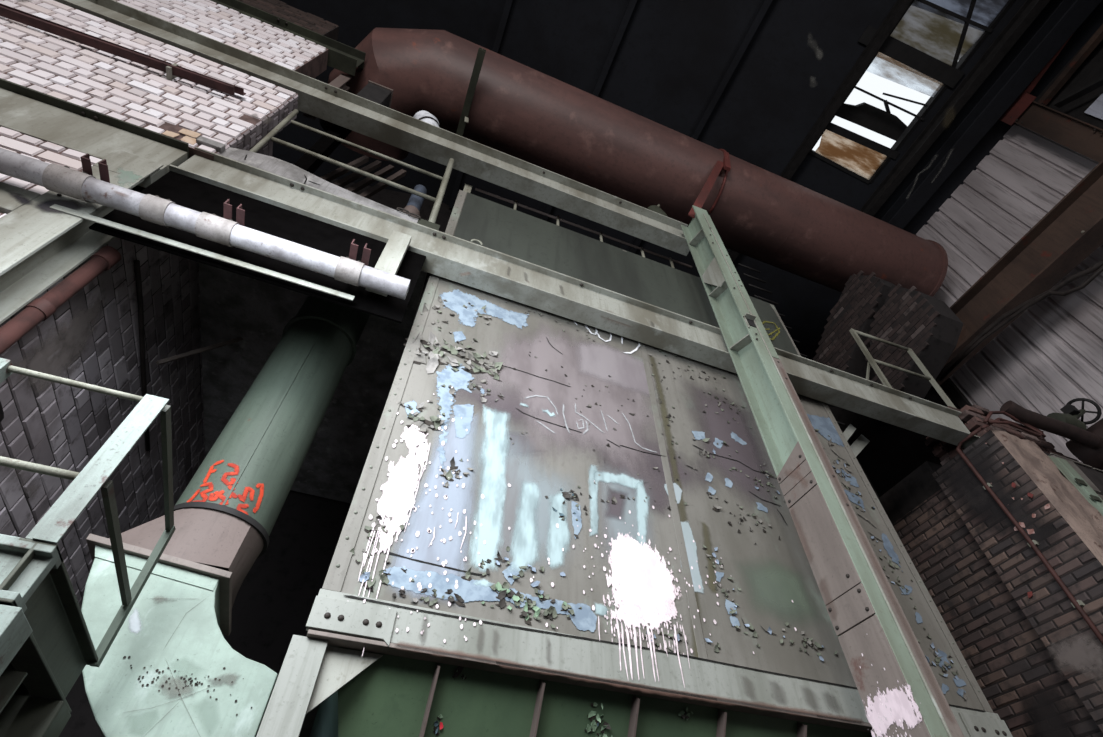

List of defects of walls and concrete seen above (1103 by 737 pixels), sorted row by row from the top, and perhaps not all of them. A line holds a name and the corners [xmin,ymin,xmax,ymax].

peeling [395,289,595,488]
peeling [645,347,786,544]
peeling [806,413,882,520]
peeling [349,515,597,632]
peeling [636,620,688,654]
peeling [702,544,839,661]
peeling [868,533,968,700]